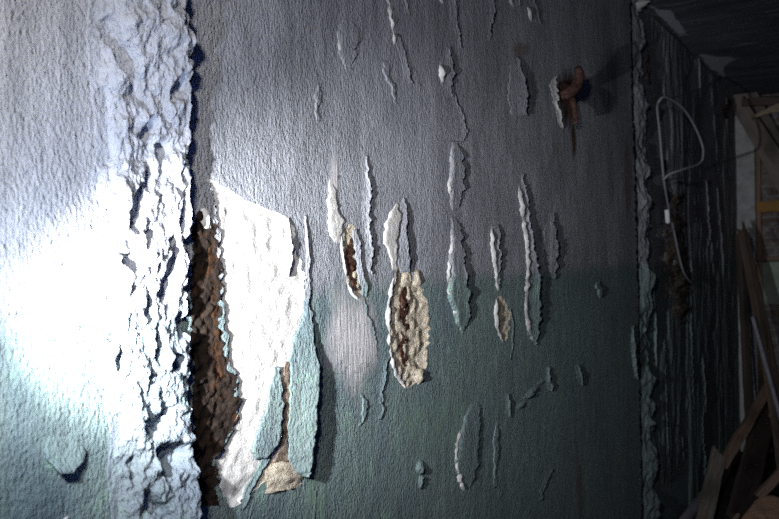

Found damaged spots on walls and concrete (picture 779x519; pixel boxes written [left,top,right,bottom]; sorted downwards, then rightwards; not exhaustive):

rust [560,99,575,155]
spalling [189,179,321,510]
spalling [327,156,431,388]
spalling [490,225,515,360]
peeling [646,6,738,506]